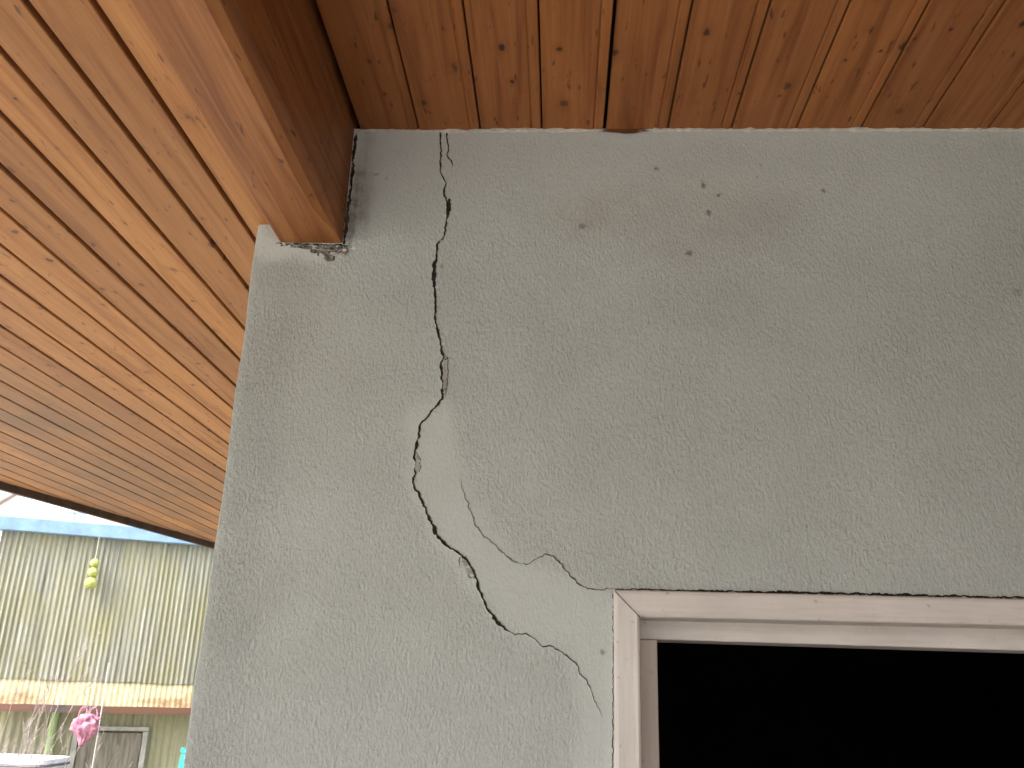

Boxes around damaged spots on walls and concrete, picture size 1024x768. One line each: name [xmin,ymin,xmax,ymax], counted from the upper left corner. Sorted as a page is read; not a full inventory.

spalling [280,242,356,261]
crack [411,132,1024,768]